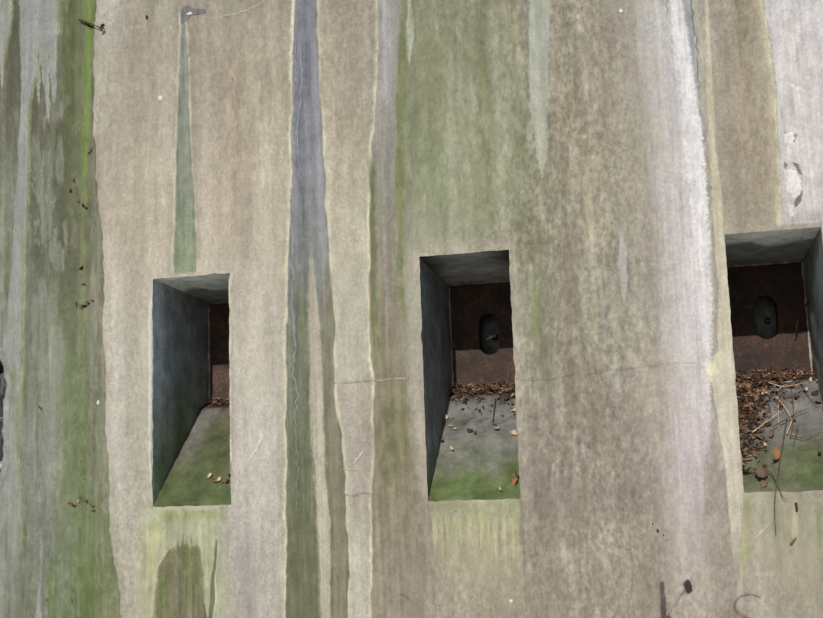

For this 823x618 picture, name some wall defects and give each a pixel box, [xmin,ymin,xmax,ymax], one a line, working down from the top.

damp [0,0,57,531]
damp [153,523,217,618]
damp [173,5,205,272]
damp [284,0,351,618]